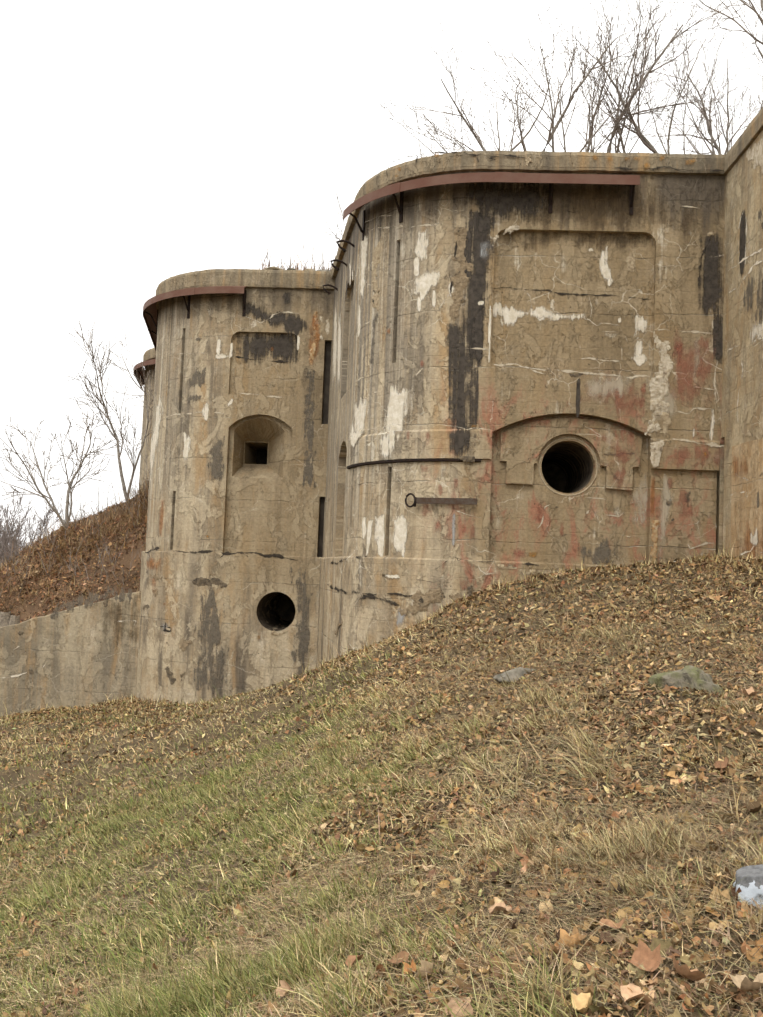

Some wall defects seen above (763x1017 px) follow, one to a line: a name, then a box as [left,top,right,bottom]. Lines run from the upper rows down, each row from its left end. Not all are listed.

crack [615,164,681,172]
leakage [746,138,763,176]
crack [698,213,762,293]
leakage [739,210,763,343]
crack [657,309,763,418]
crack [658,438,724,447]
crack [586,497,646,538]
crack [145,547,295,560]
leakage [194,590,229,695]